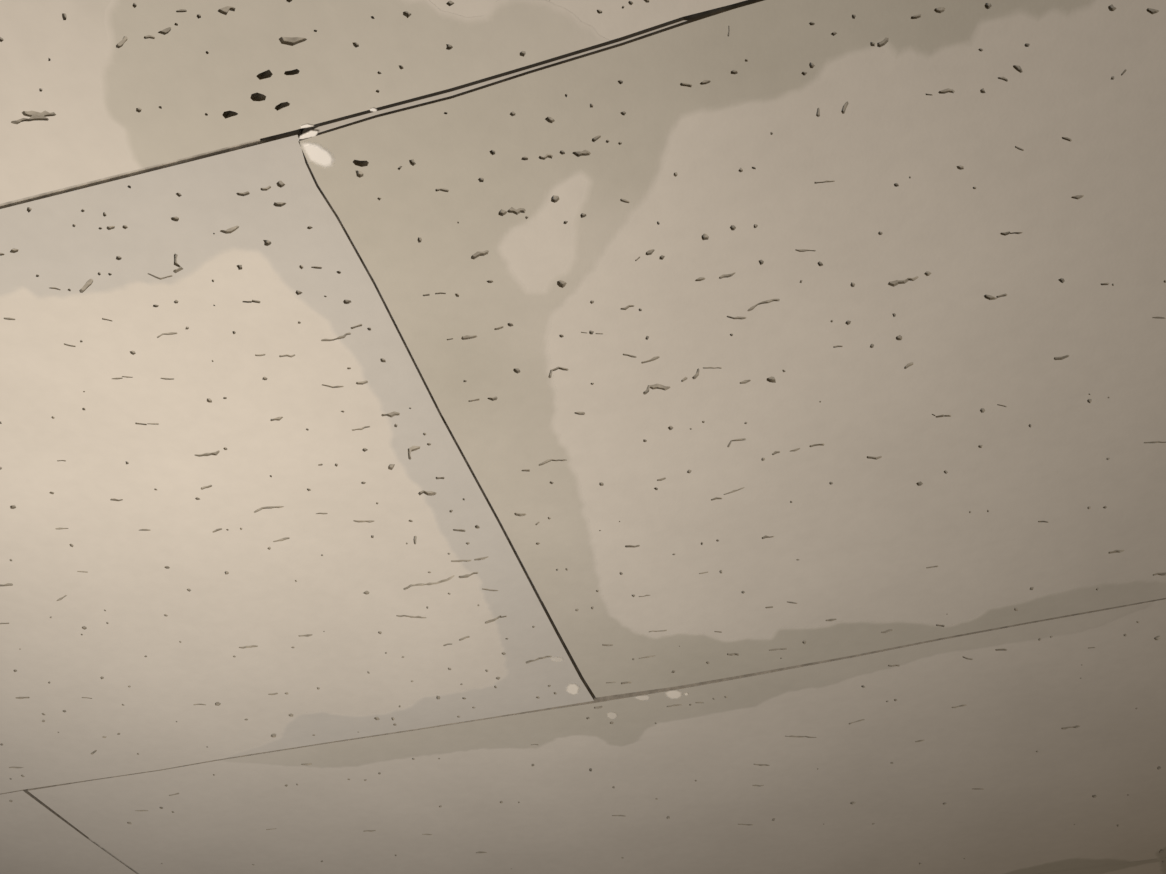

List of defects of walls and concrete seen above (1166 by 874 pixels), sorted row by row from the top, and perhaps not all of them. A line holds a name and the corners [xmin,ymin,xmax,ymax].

damp [64,0,609,170]
damp [0,135,1155,769]